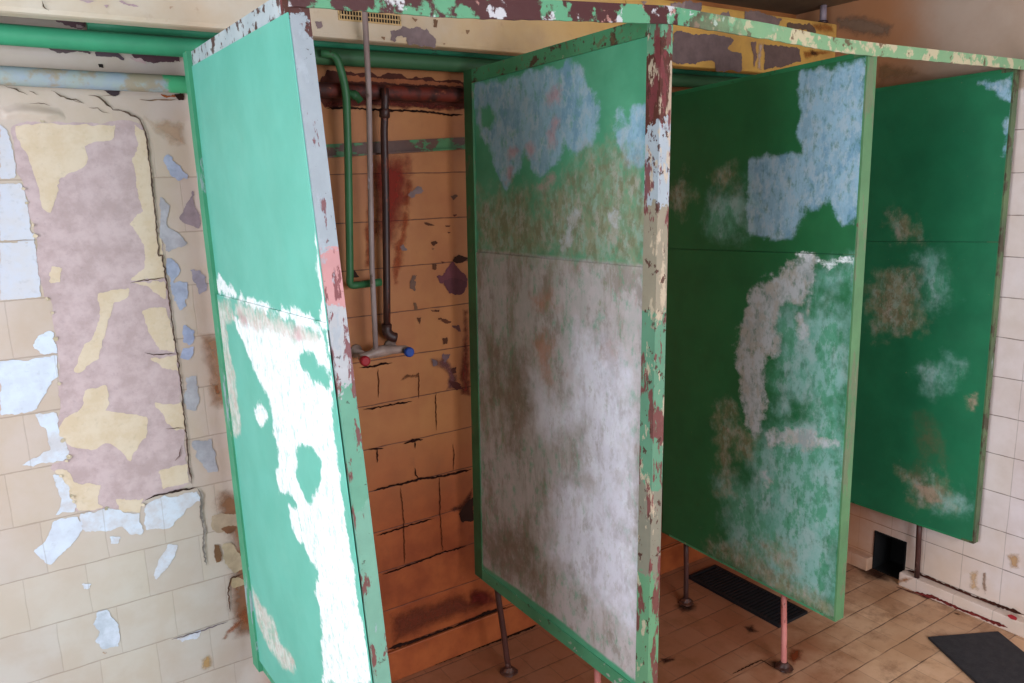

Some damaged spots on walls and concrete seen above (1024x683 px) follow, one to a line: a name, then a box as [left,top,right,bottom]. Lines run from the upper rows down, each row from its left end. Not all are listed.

peeling [672,31,801,72]
peeling [744,10,816,33]
corrosion [366,161,409,276]
flaking render [432,255,468,295]
crack [4,85,207,565]
flaking render [0,120,218,565]
peeling [431,310,463,390]
crack [361,362,471,574]
peeling [154,544,178,579]
flaking render [211,513,244,588]
crack [389,607,506,649]
leakage [436,625,536,665]